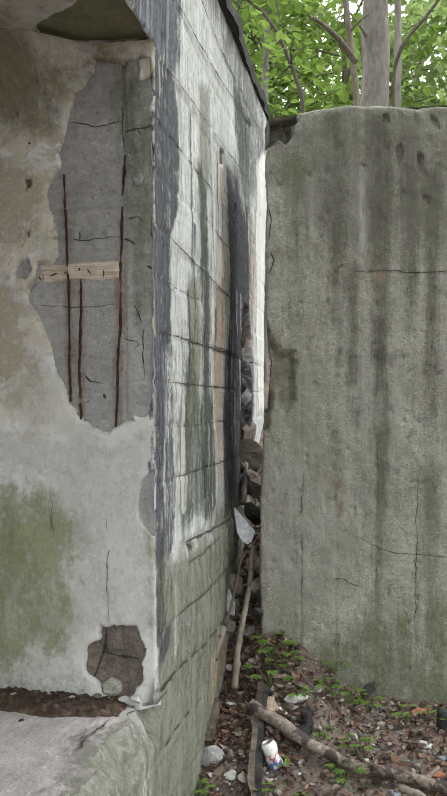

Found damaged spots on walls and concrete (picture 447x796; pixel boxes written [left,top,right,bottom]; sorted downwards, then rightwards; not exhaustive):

spalling [37,0,149,42]
spalling [16,54,158,432]
water stain [348,114,392,521]
crack [349,270,444,278]
crack [336,469,444,633]
spalling [72,625,152,796]